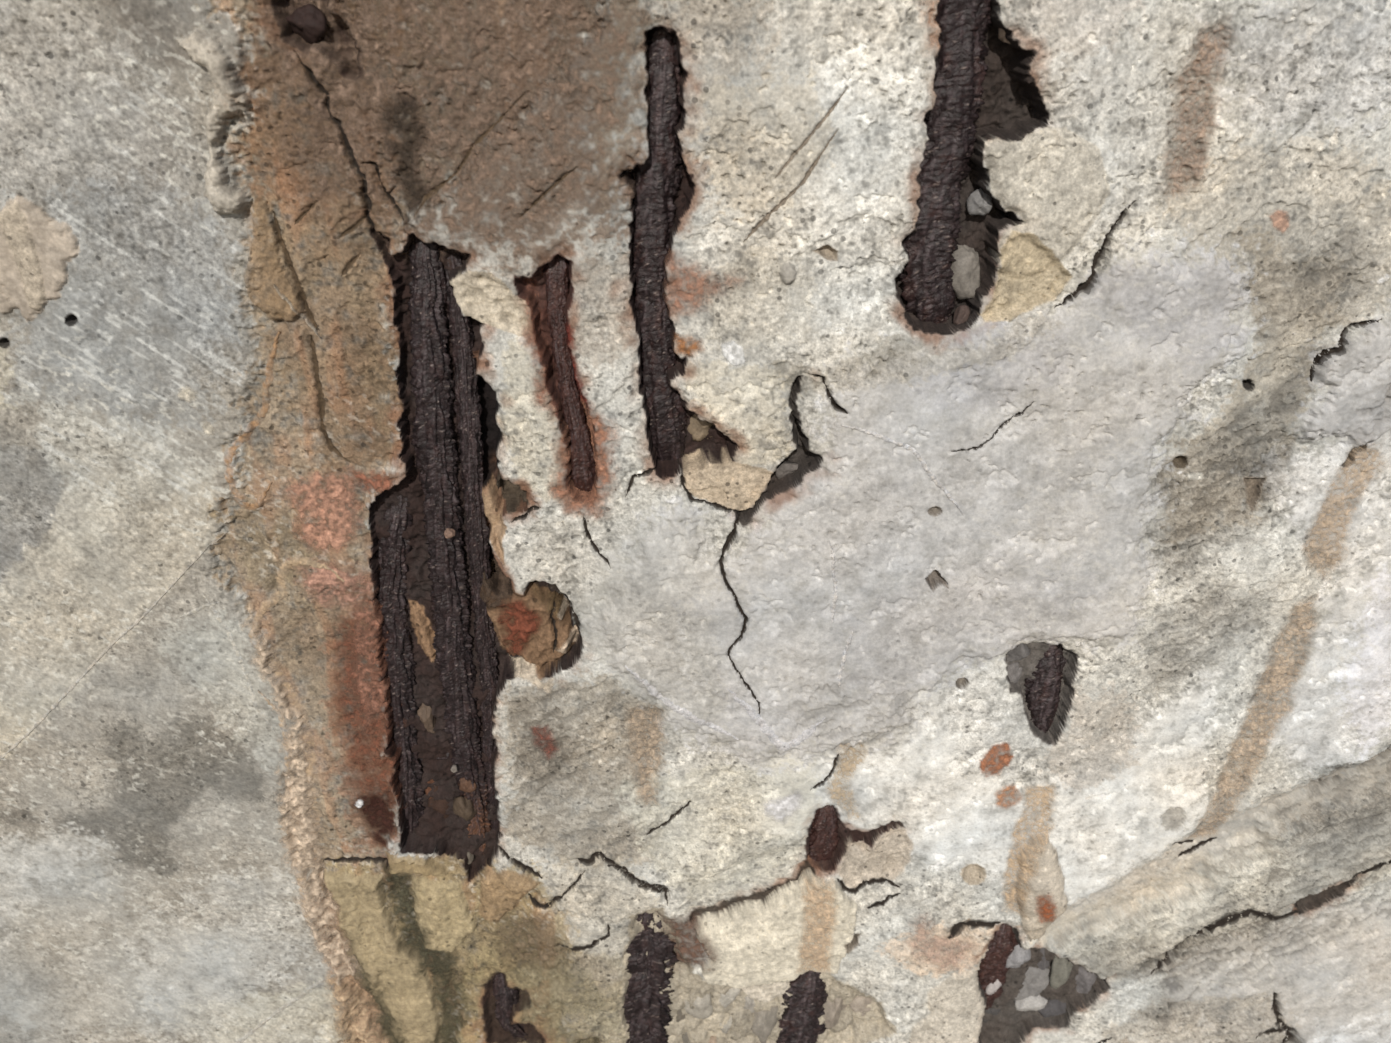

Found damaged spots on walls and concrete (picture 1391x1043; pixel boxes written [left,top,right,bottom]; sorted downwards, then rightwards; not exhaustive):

spalling [271,0,364,79]
spalling [272,201,351,463]
rust [551,326,610,514]
crack [811,374,848,414]
peeling [324,0,1255,1043]
crack [625,458,760,714]
rust [286,472,397,845]
crack [647,801,691,835]
crack [499,846,901,920]
crack [1172,837,1217,857]
crack [556,925,610,952]
crack [1151,909,1299,975]